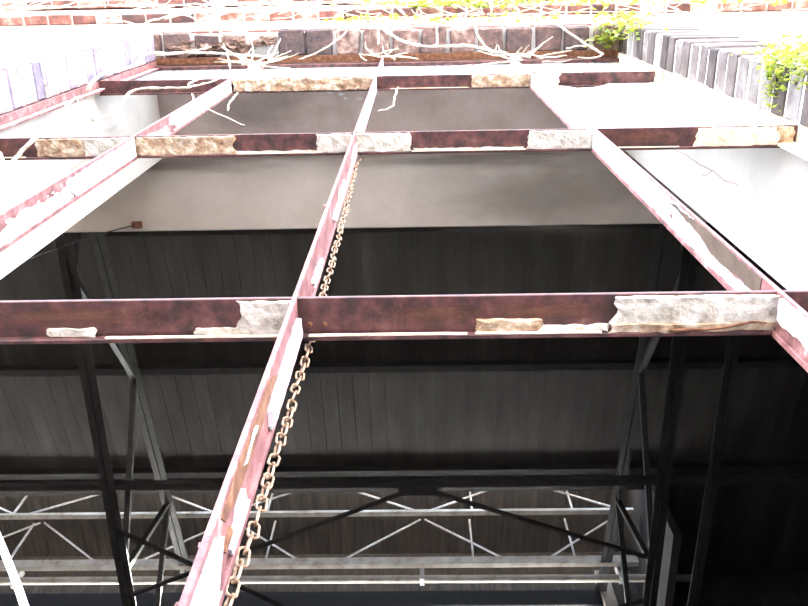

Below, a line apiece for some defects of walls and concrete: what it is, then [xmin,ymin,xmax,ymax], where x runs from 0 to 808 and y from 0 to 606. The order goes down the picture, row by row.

peeling [0,57,808,465]
peeling [190,488,250,606]
corrosion [220,375,278,553]